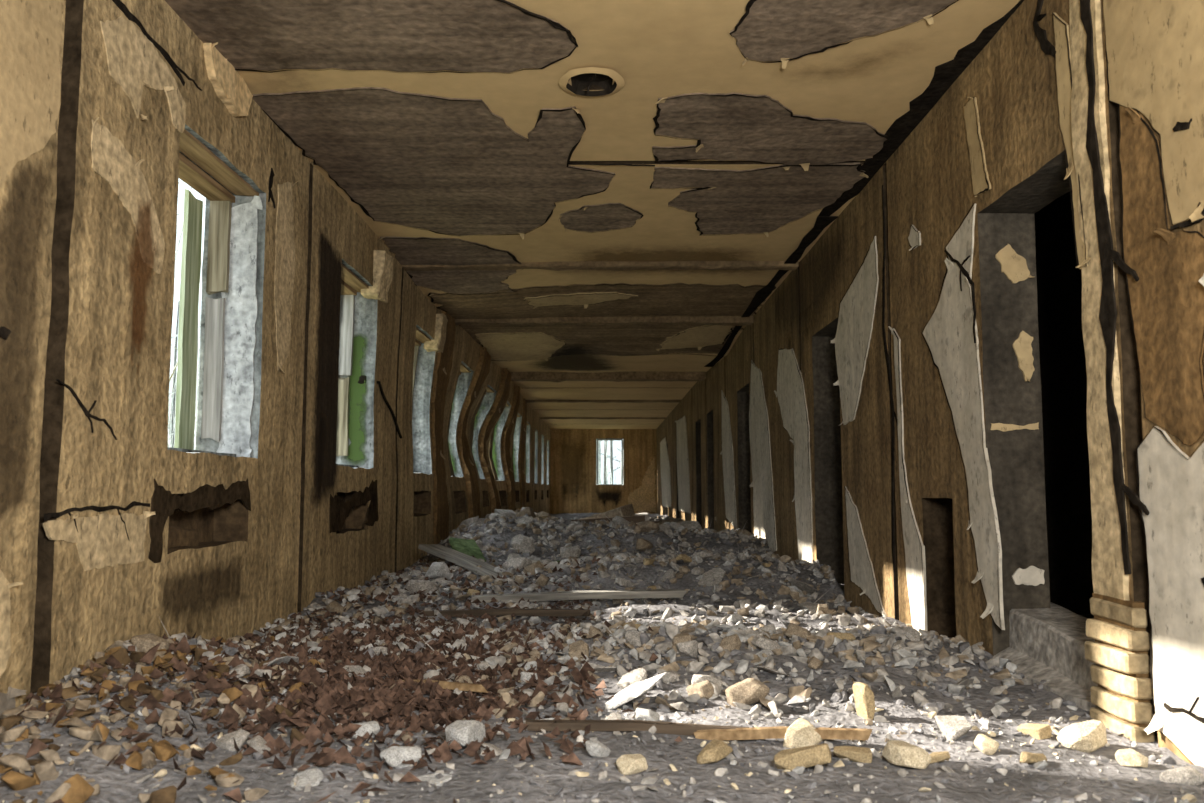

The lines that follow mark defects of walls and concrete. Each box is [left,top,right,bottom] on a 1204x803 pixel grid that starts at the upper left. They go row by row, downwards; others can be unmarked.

water stain [0,168,44,516]
flaking render [0,0,61,184]
crack [43,501,151,541]
crack [112,0,202,91]
flaking render [216,181,298,457]
peeling [165,0,776,361]
crack [704,0,1056,620]
flaking render [888,326,927,635]
flaking render [922,97,1005,630]
crack [1080,0,1149,574]
spalling [1102,0,1204,767]
crack [1163,697,1204,724]